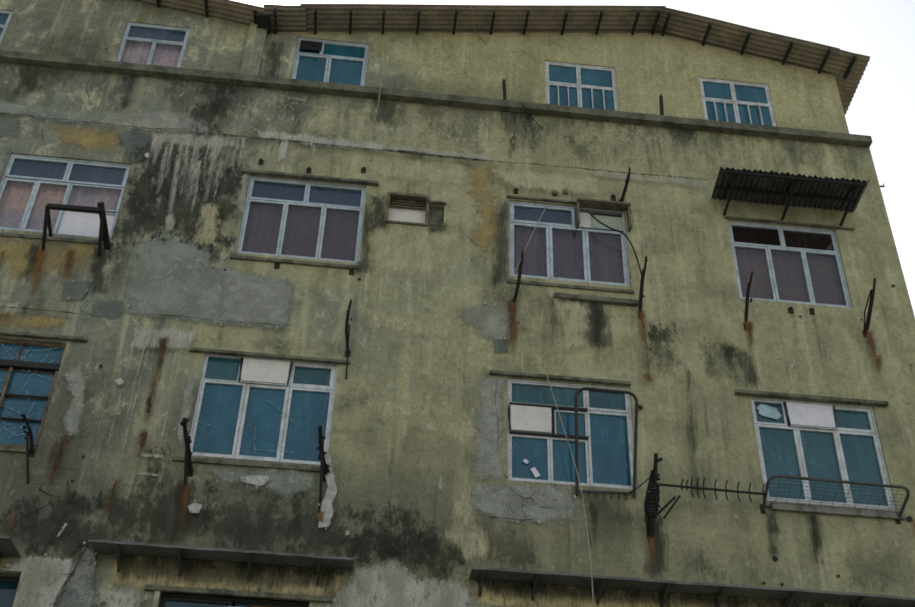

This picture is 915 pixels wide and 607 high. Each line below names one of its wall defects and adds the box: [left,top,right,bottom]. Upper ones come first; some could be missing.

damp [13,62,49,94]
damp [0,82,248,293]
damp [552,297,612,349]
spalling [65,367,88,435]
corrosion [146,337,167,413]
damp [709,343,758,386]
damp [0,446,488,581]
spalling [318,454,337,529]
crack [481,483,552,521]
peeling [0,542,148,607]
damp [111,554,343,595]